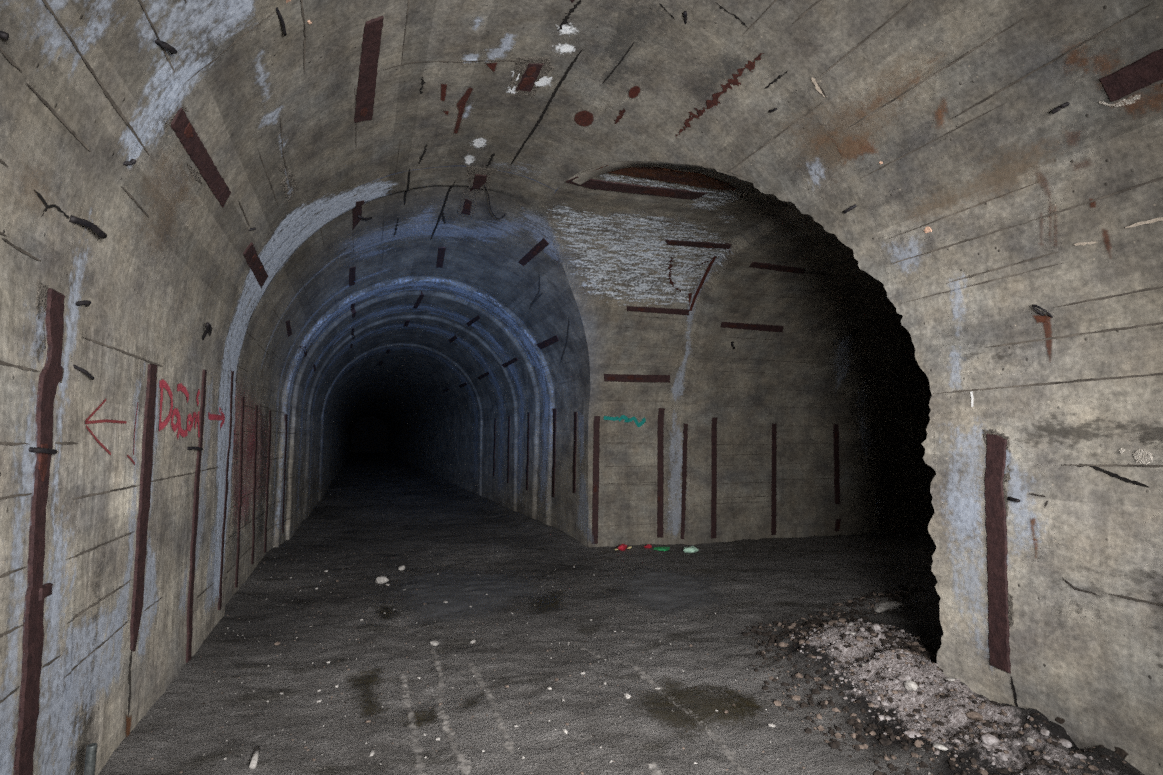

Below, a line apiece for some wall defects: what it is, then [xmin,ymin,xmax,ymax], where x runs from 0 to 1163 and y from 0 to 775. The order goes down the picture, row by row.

leakage [39,0,111,70]
leakage [120,0,253,168]
leakage [526,174,738,320]
crack [1078,463,1149,488]
crack [1063,578,1098,595]